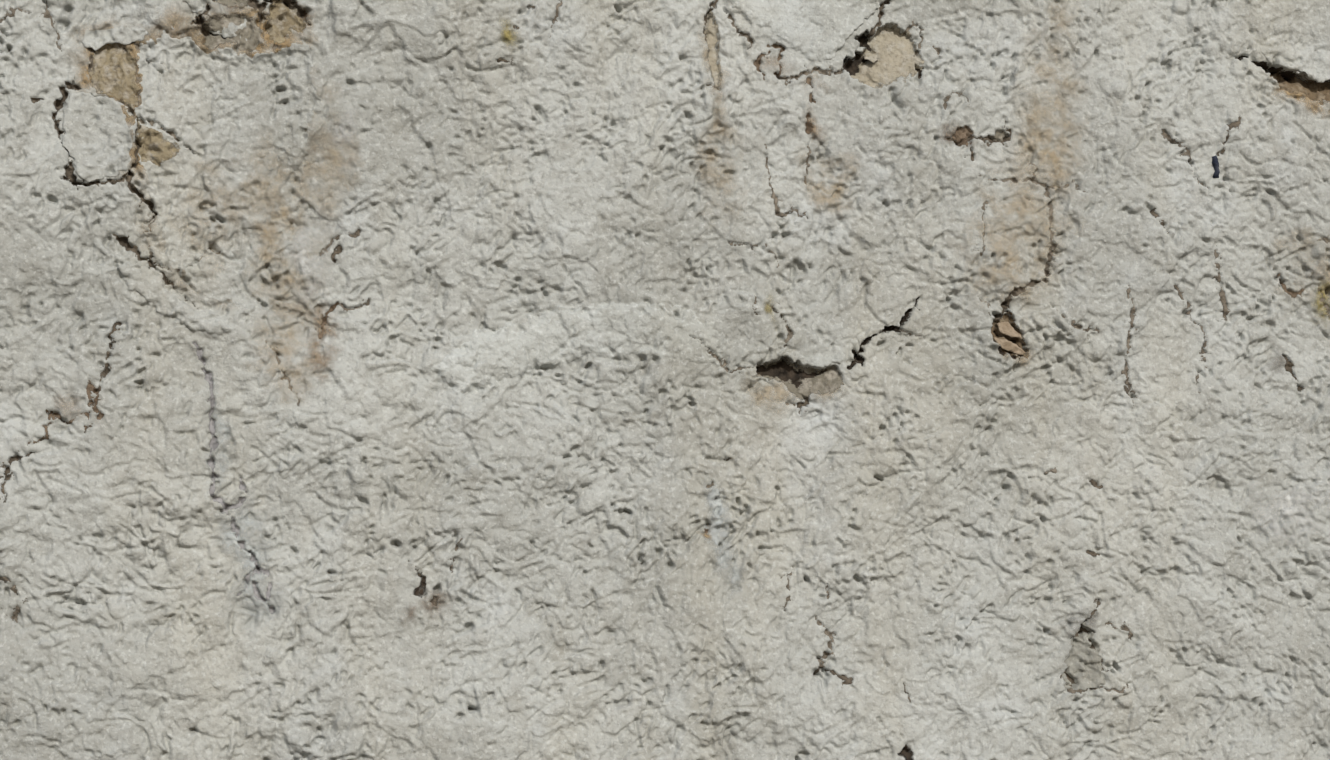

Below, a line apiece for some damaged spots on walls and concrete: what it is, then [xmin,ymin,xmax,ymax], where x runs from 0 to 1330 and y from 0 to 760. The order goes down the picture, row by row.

crack [726,13,843,104]
flaking render [1235,46,1330,111]
peeling [31,0,322,310]
crack [947,121,1139,408]
crack [689,297,794,373]
crack [847,295,925,370]
crack [1174,242,1230,394]